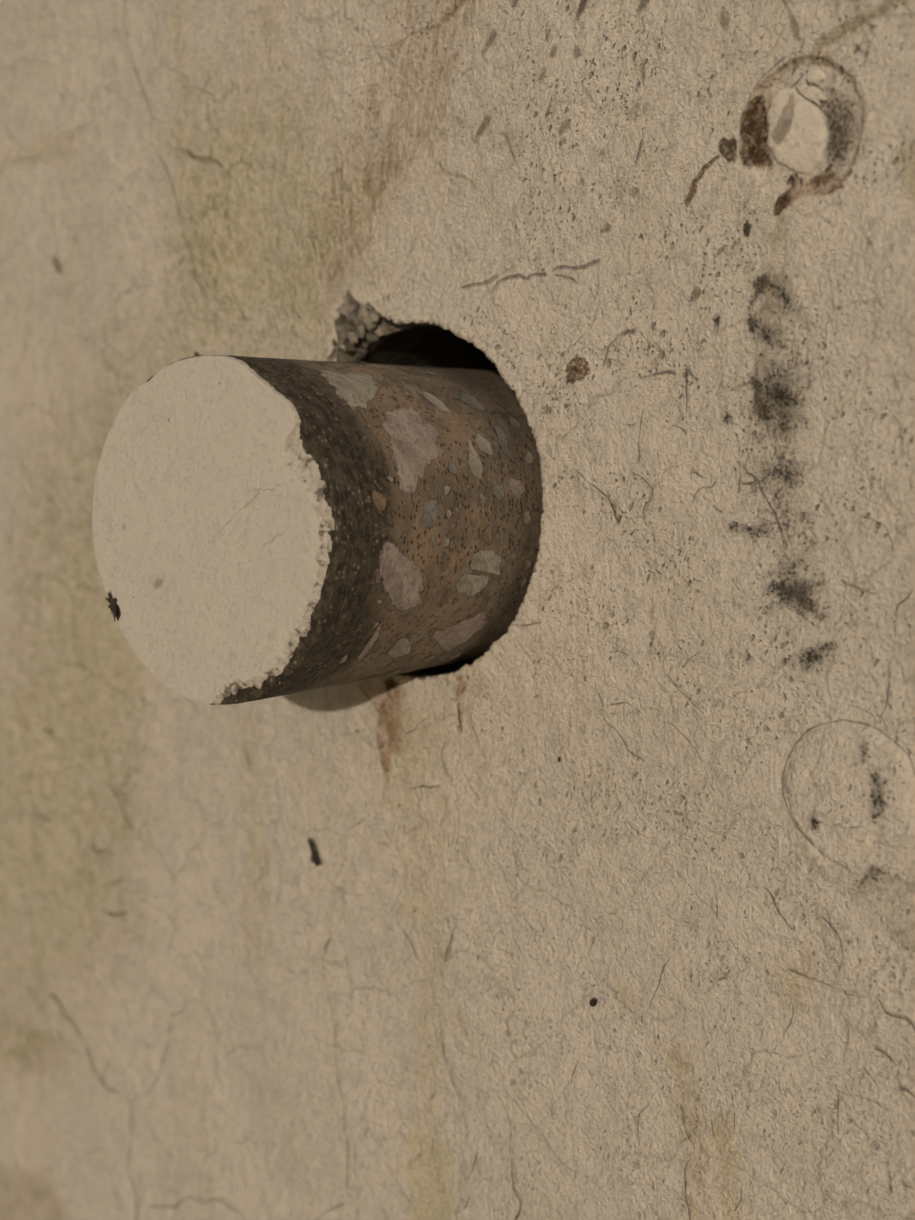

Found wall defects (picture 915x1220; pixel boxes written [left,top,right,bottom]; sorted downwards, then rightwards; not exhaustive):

rust [685,96,772,206]
rust [774,163,844,215]
spalling [326,289,437,363]